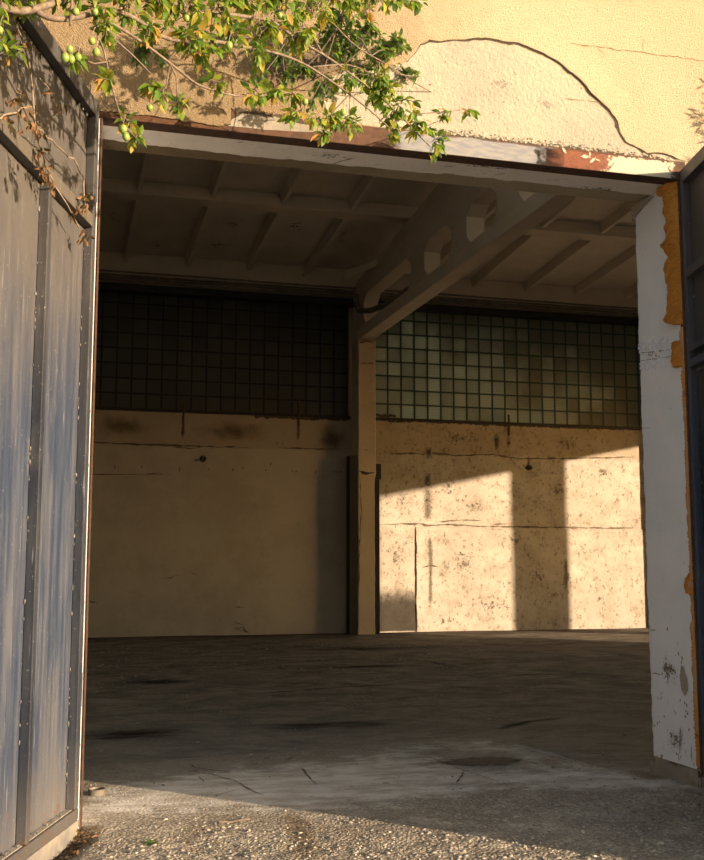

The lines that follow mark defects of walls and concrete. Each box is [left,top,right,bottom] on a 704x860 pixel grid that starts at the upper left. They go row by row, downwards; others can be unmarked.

flaking render [323,40,686,170]
crack [408,22,704,162]
corrosion [536,148,628,171]
spalling [658,581,700,769]
crack [189,764,265,797]